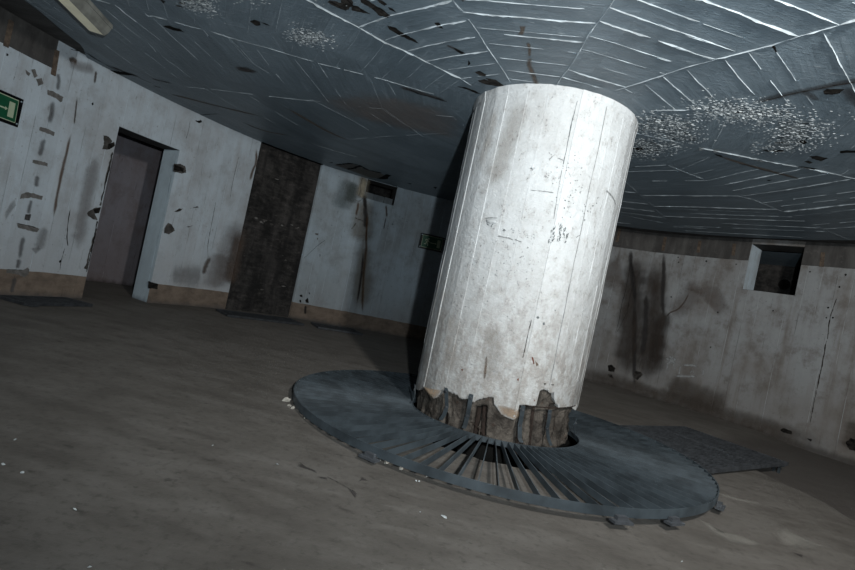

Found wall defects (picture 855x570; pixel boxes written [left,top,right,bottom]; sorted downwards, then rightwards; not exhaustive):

crack [762,80,855,102]
damp [593,253,782,434]
crack [810,299,837,422]
spalling [416,383,576,466]